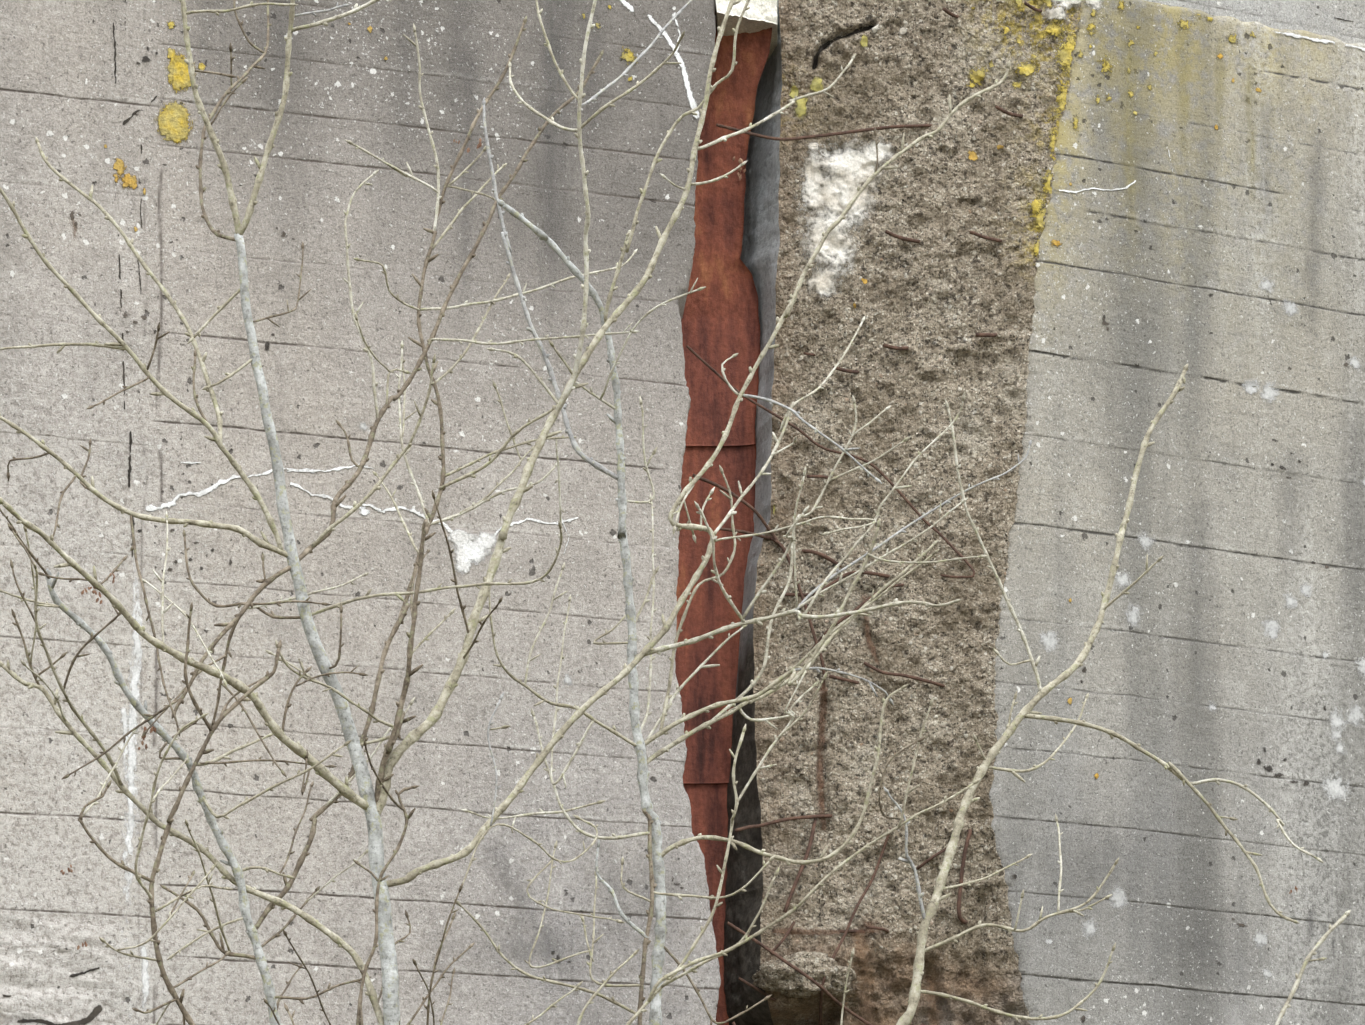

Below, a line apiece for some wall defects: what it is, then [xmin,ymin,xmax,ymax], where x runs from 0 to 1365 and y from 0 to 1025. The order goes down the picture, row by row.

crack [112,0,126,83]
crack [812,25,876,69]
damp [1275,32,1365,52]
crack [123,96,157,154]
spalling [716,124,932,151]
crack [118,199,578,574]
rust [675,14,772,1025]
spalling [682,401,904,688]
spalling [686,345,975,579]
spalling [712,814,872,1025]
rust [774,923,883,934]
spalling [831,827,891,959]